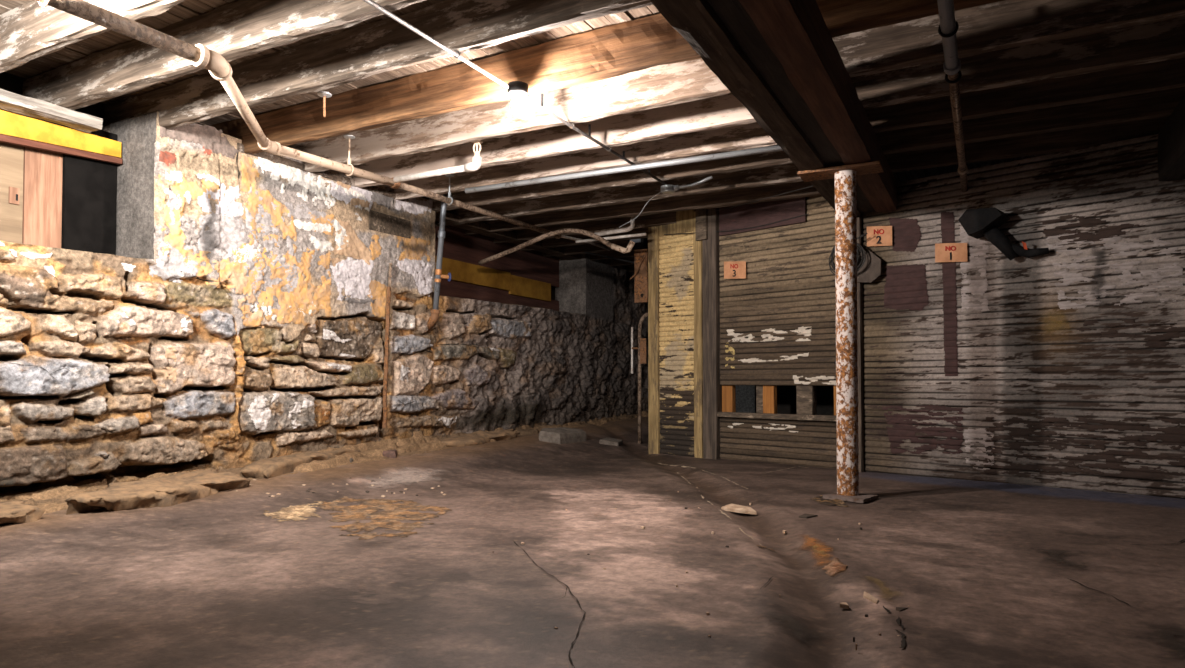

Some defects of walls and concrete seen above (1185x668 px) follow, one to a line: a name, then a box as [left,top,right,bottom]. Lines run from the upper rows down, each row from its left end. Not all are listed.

peeling [149,124,433,329]
peeling [884,212,990,376]
peeling [1042,216,1185,348]
peeling [725,326,811,369]
peeling [793,375,836,385]
peeling [727,423,798,432]
peeling [882,404,1185,481]
crack [514,541,586,668]
crack [883,606,906,648]